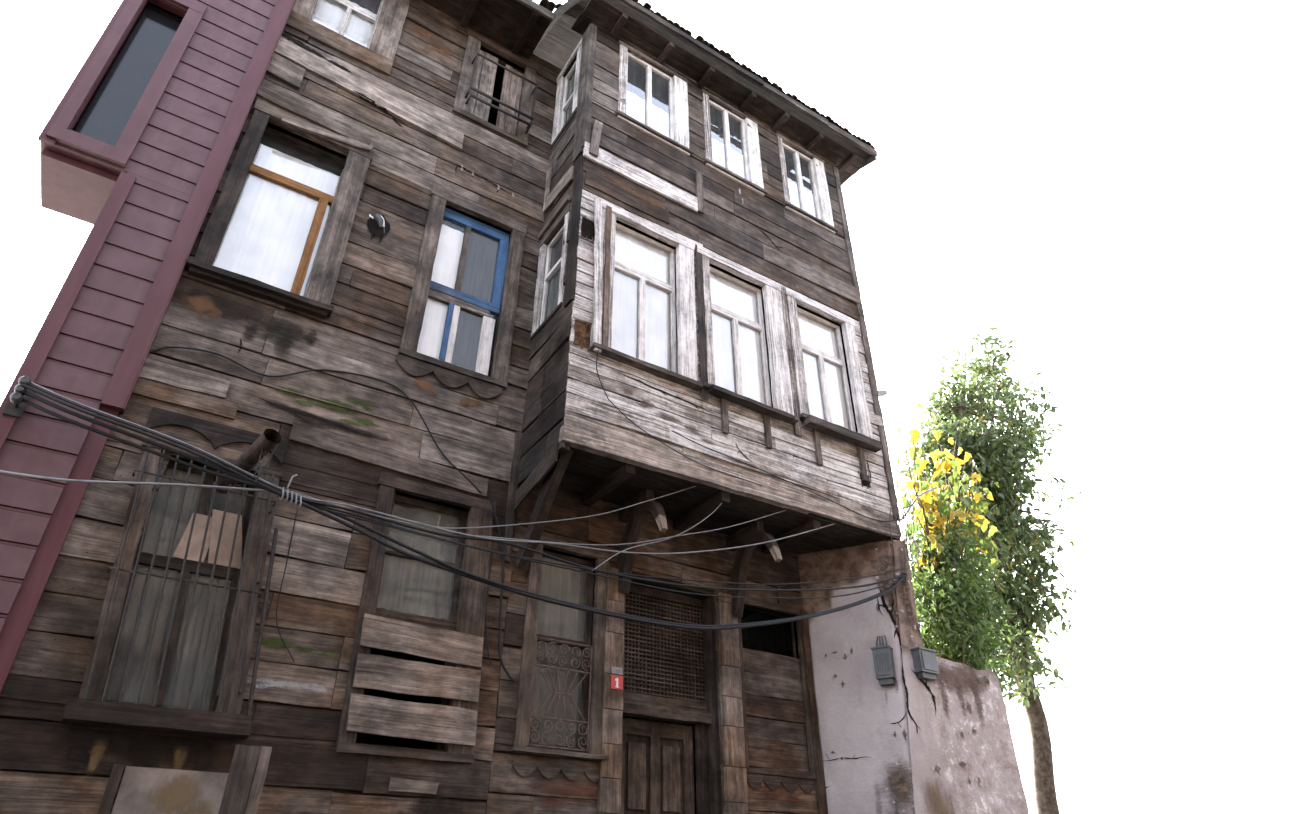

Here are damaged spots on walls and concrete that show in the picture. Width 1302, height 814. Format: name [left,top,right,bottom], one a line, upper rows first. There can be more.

water stain [927,787,954,814]